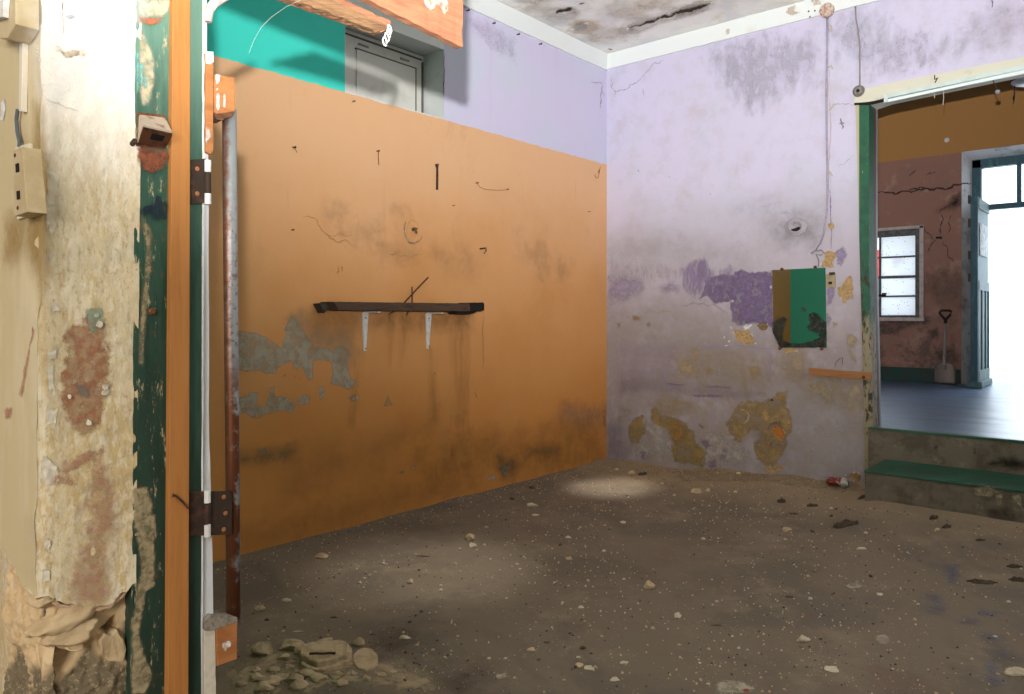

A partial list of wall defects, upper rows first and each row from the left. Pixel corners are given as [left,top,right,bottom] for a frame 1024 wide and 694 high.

peeling [139,0,169,16]
crack [609,1,710,50]
peeling [140,31,154,105]
crack [593,60,663,108]
crack [878,170,972,195]
crack [926,215,953,261]
peeling [658,261,773,346]
peeling [46,309,109,435]
peeling [238,317,358,418]
flaking render [1,467,127,694]